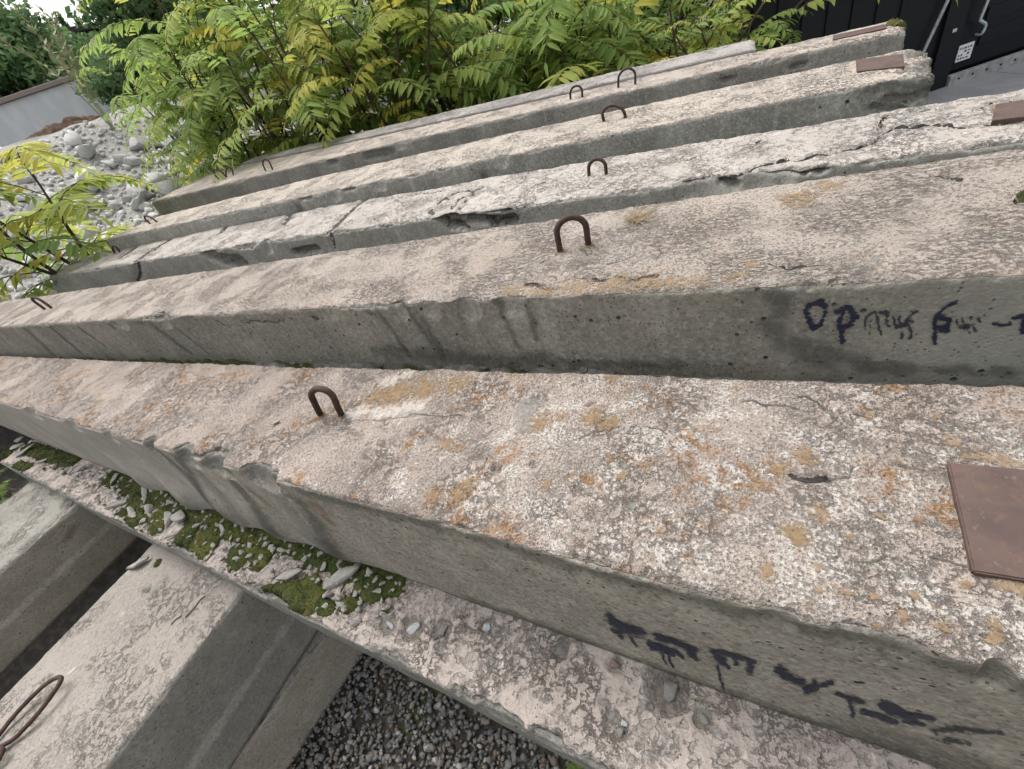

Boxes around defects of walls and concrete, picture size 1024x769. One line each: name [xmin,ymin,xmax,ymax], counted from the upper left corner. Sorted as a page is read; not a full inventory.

crack [738,101,1020,177]
crack [937,175,963,183]
spalling [441,208,519,233]
spalling [175,445,278,483]